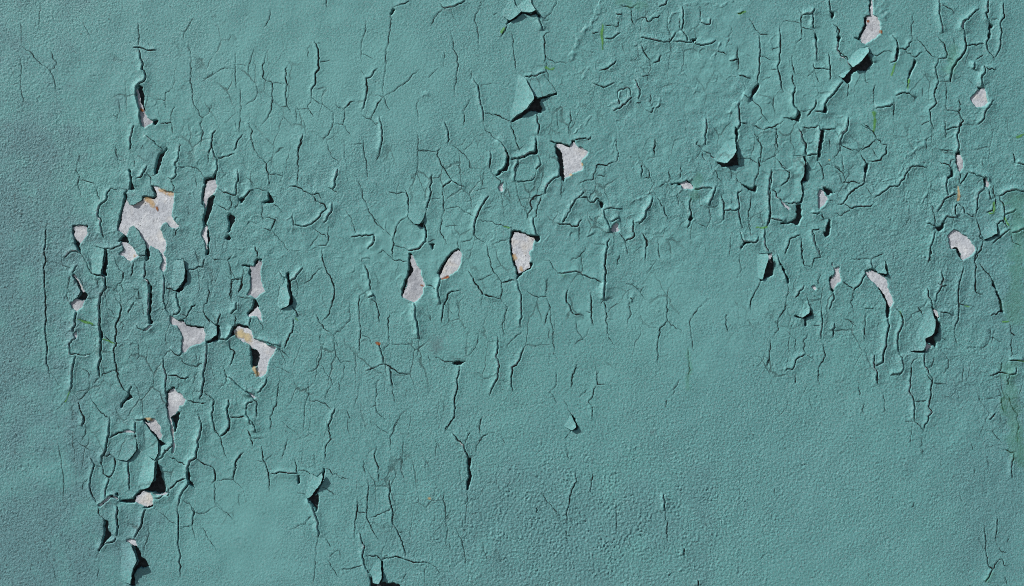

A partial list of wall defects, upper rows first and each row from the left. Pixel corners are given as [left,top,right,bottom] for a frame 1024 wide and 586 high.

peeling [839,0,880,83]
peeling [118,186,187,292]
peeling [170,259,280,377]
crack [43,1,681,583]
peeling [510,231,540,277]
peeling [553,141,588,181]
crack [657,292,704,407]
crack [593,0,925,382]
peeling [853,254,893,318]
crack [865,0,1024,473]
peeling [110,387,204,508]
crack [984,518,1009,584]